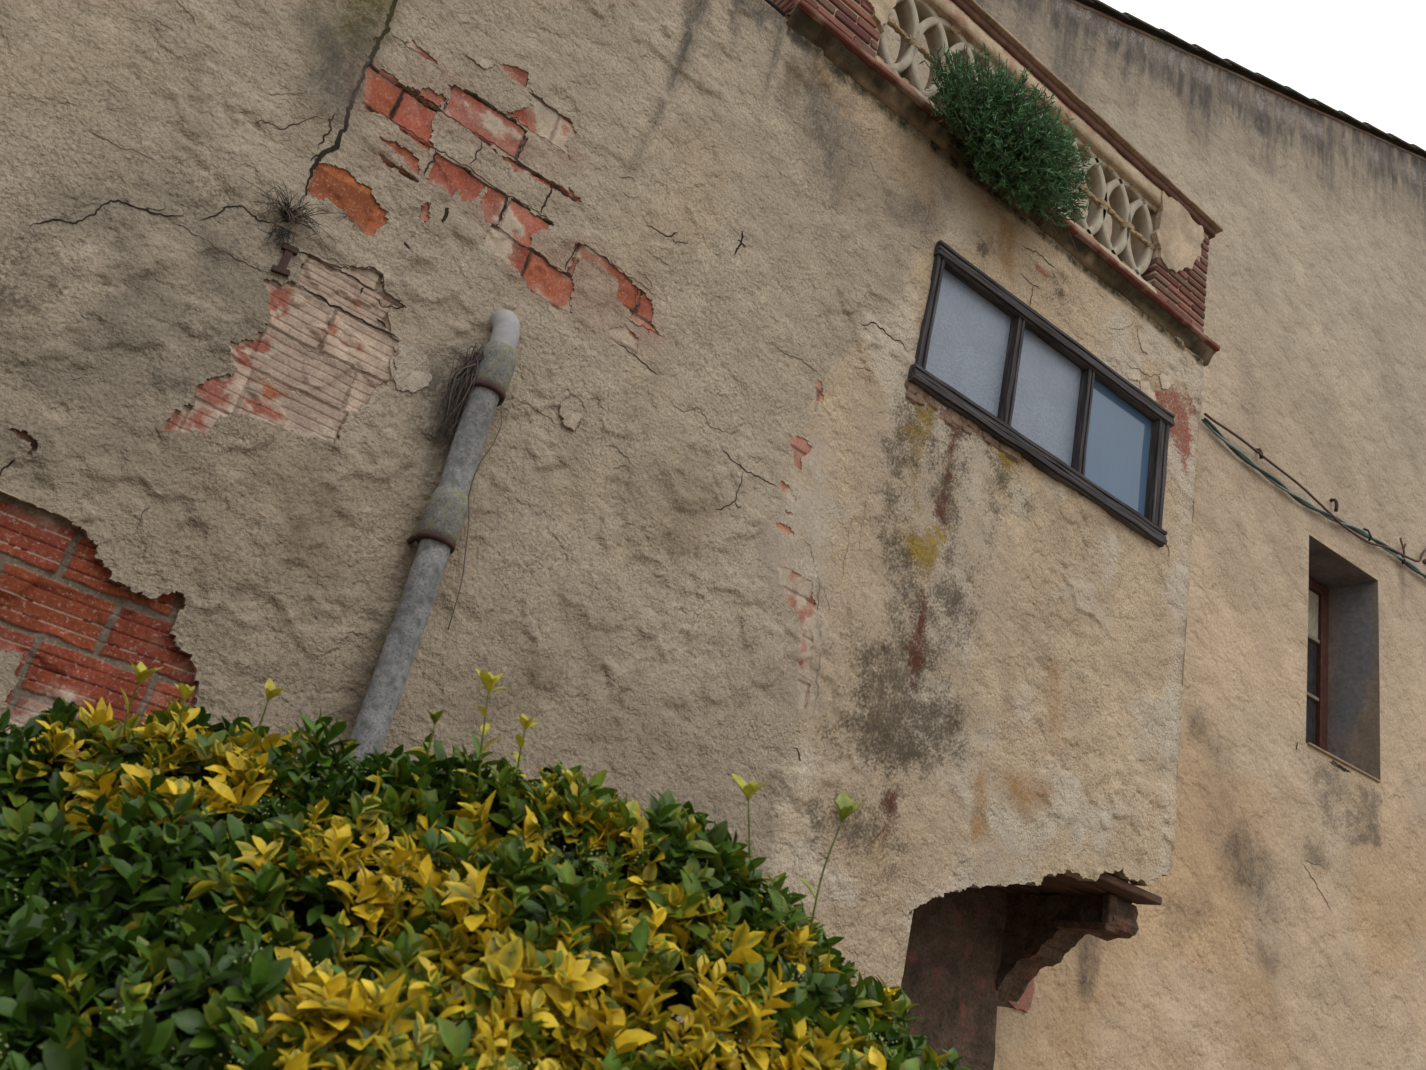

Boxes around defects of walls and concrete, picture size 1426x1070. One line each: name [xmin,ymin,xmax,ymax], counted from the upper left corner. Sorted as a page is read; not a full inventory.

flaking render [0,491,199,741]